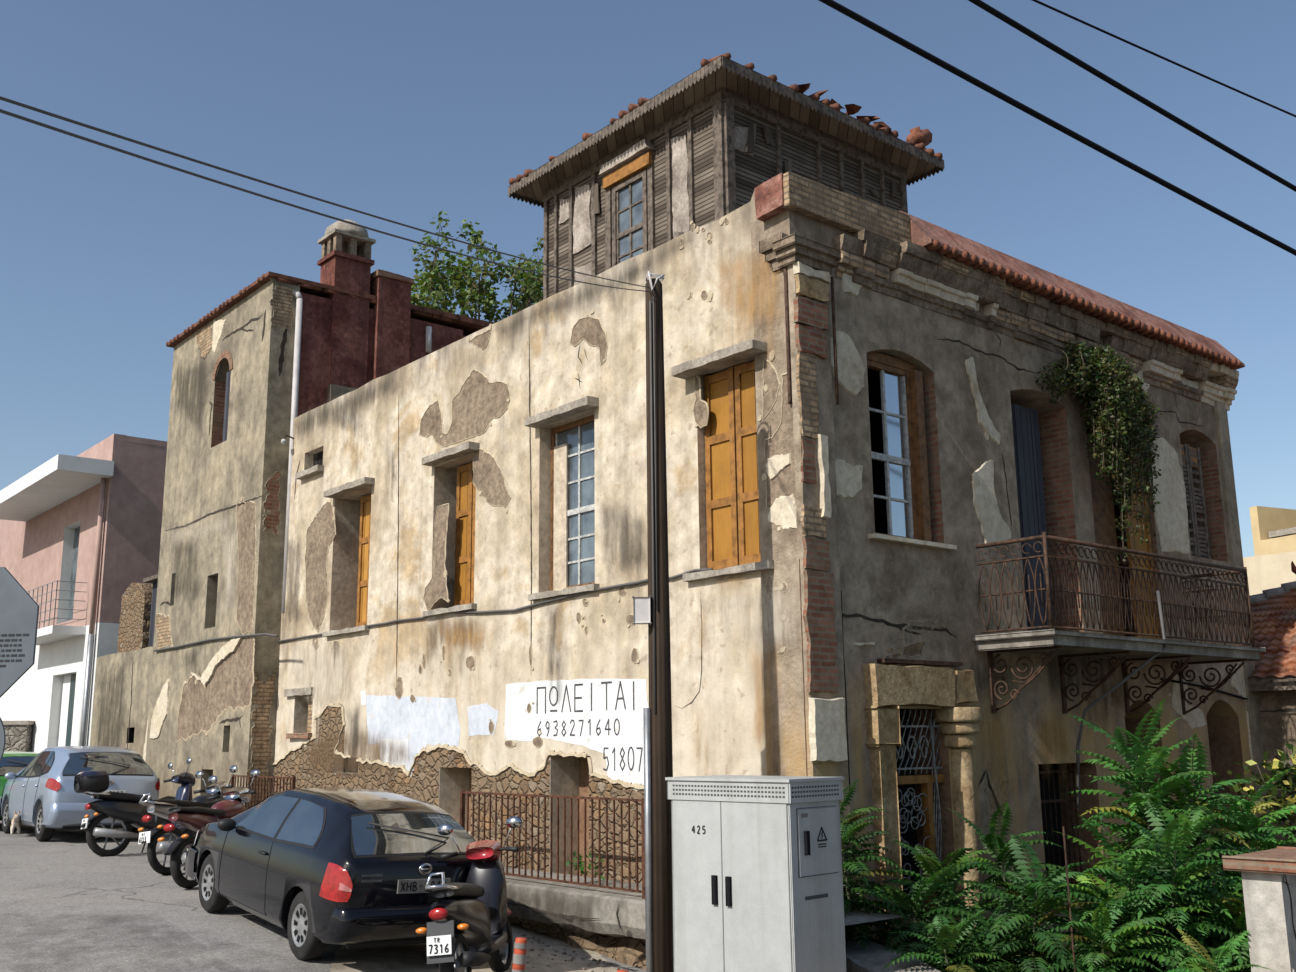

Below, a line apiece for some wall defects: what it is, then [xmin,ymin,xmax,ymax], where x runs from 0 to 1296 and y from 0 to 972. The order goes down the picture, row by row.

crack [222,311,288,376]
peeling [570,310,608,365]
peeling [830,330,865,396]
peeling [965,357,1001,445]
peeling [419,369,512,514]
peeling [972,459,1012,543]
peeling [305,501,340,660]
peeling [143,471,282,808]
crack [843,613,956,638]
spalling [488,719,516,748]
spalling [533,731,543,748]